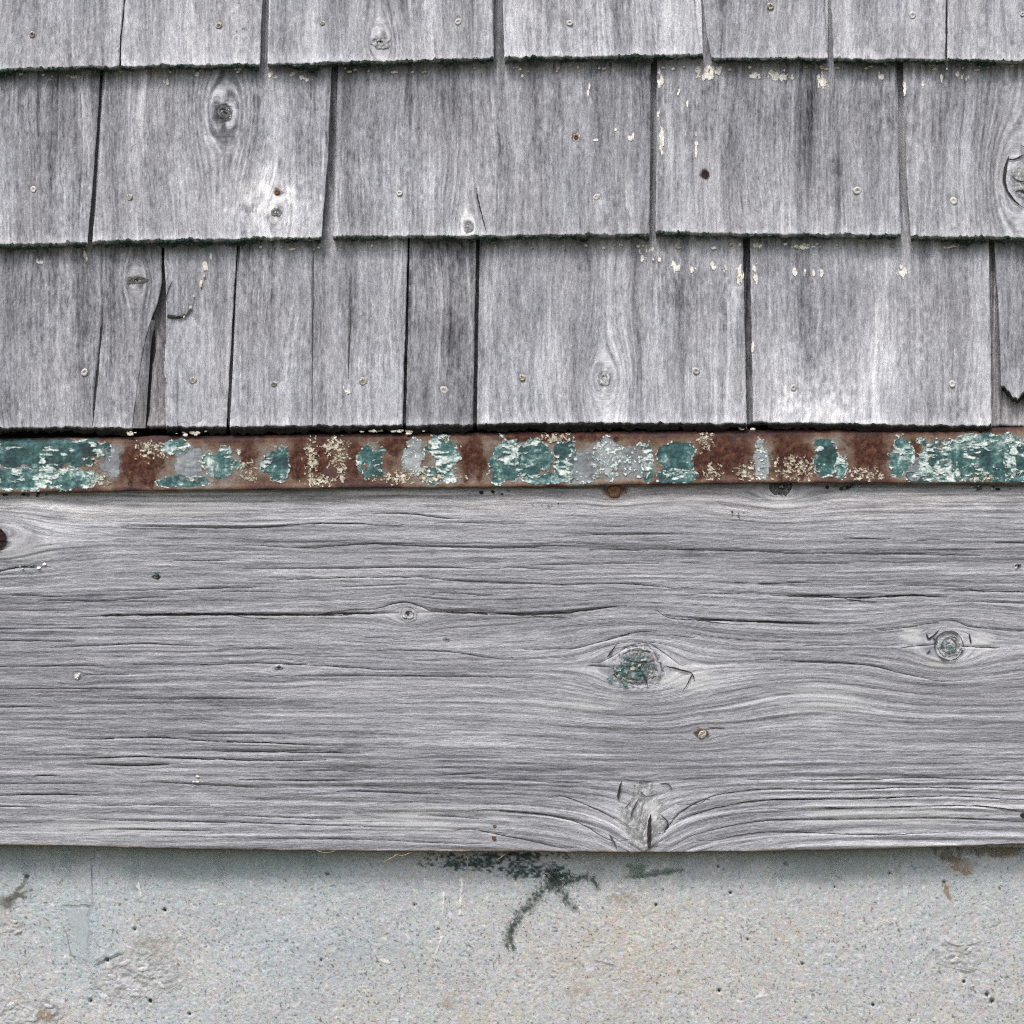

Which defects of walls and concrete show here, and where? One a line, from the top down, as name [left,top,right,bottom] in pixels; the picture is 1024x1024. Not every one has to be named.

peeling [639,245,696,273]
crack [146,330,156,426]
peeling [126,253,1024,495]
peeling [0,439,120,497]
rust [120,447,164,488]
rust [287,438,332,479]
rust [460,436,487,482]
rust [693,435,750,482]
rust [772,434,815,482]
crack [0,513,1024,708]
crack [0,733,1024,849]
damp [422,852,597,949]